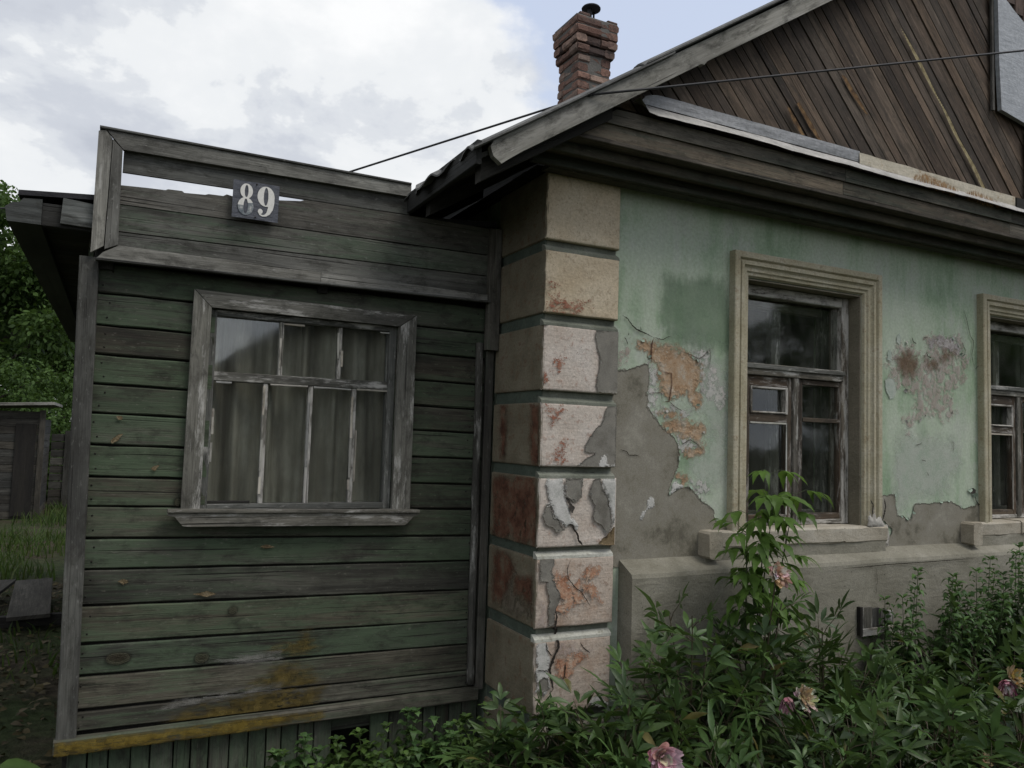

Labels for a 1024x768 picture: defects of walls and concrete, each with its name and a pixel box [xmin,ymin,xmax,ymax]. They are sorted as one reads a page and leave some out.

flaking render [492,330,728,627]
peeling [882,333,980,547]
flaking render [535,641,589,697]
crack [537,613,590,694]